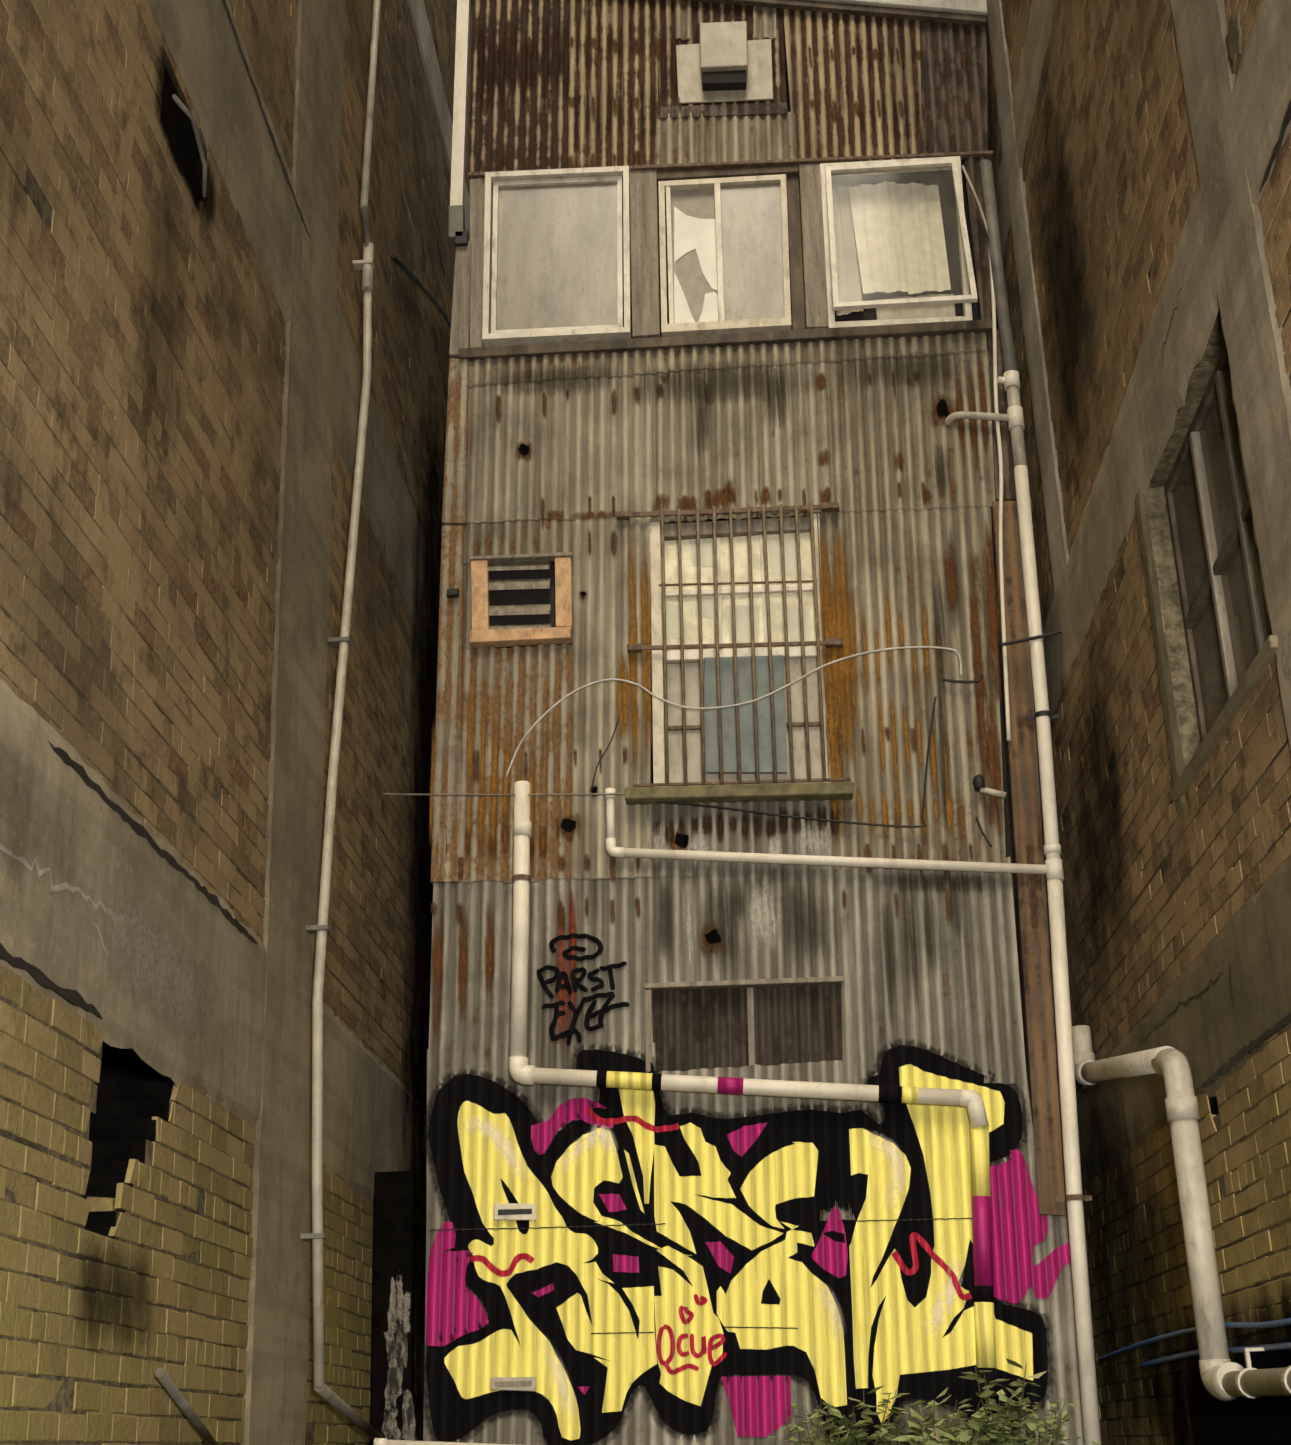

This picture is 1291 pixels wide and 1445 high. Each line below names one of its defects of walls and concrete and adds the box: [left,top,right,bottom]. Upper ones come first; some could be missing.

rust [476,3,697,165]
rust [748,34,785,76]
rust [852,28,922,76]
rust [854,91,925,142]
rust [655,483,735,520]
rust [430,680,580,880]
rust [540,496,651,763]
rust [652,535,953,920]
rust [946,526,1001,827]
crack [0,844,185,959]
spalling [86,1197,116,1212]
peeling [382,1276,416,1441]